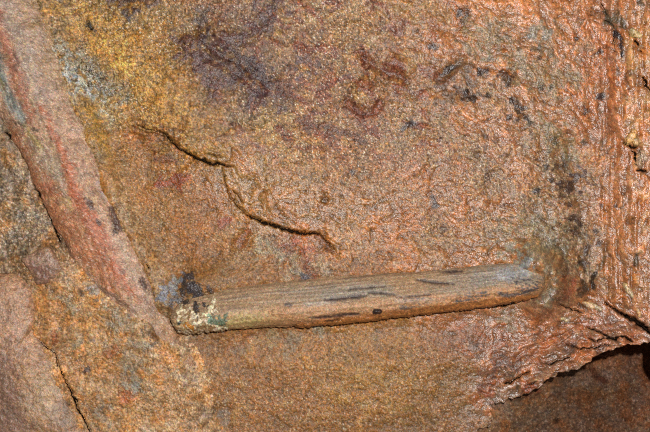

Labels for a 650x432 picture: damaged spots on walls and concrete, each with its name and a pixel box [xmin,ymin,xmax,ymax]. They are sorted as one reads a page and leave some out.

crack [143,127,333,247]
crack [37,340,90,432]